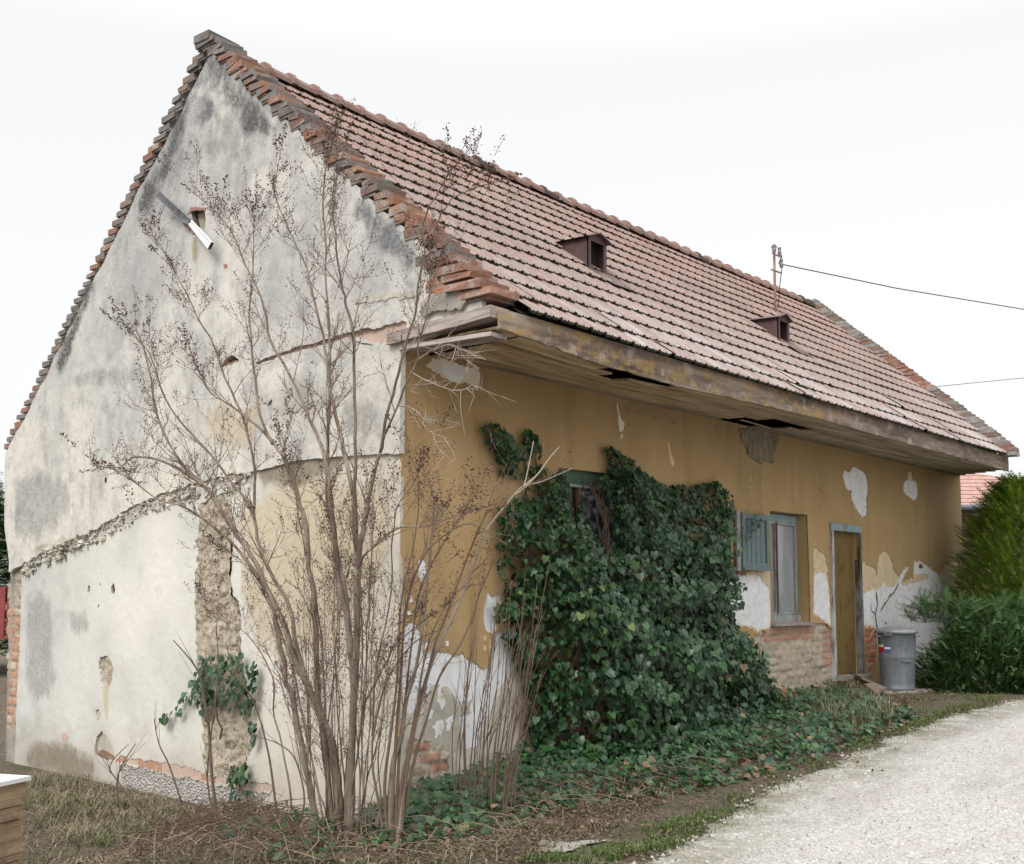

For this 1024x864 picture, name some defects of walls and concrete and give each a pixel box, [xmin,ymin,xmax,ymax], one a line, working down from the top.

water stain [208,60,275,135]
water stain [139,114,184,210]
water stain [58,286,93,372]
peeling [426,358,481,390]
peeling [843,467,868,518]
peeling [903,472,918,500]
flaking render [6,471,272,816]
flaking render [723,548,832,691]
peeling [862,551,961,677]
peeling [396,592,551,799]